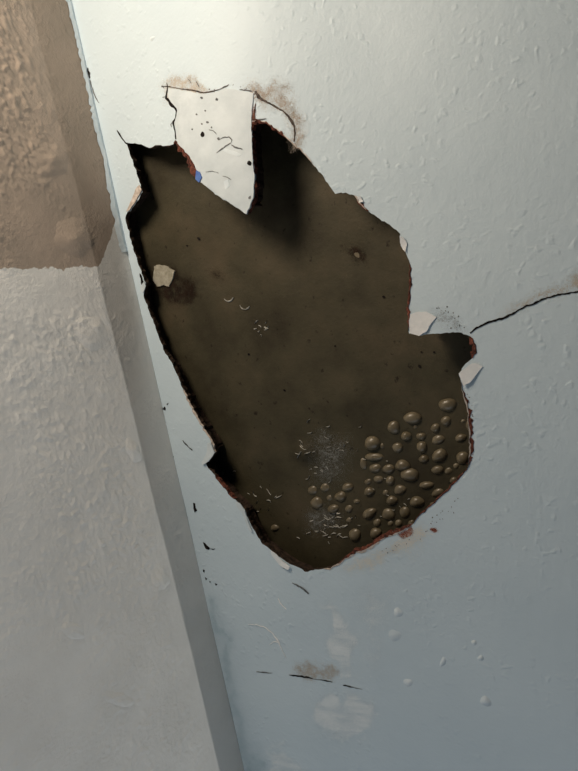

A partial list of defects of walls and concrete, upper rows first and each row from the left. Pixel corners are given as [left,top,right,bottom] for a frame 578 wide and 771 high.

crack [161,79,296,142]
spalling [125,88,483,572]
crack [470,291,578,334]
crack [290,675,362,690]